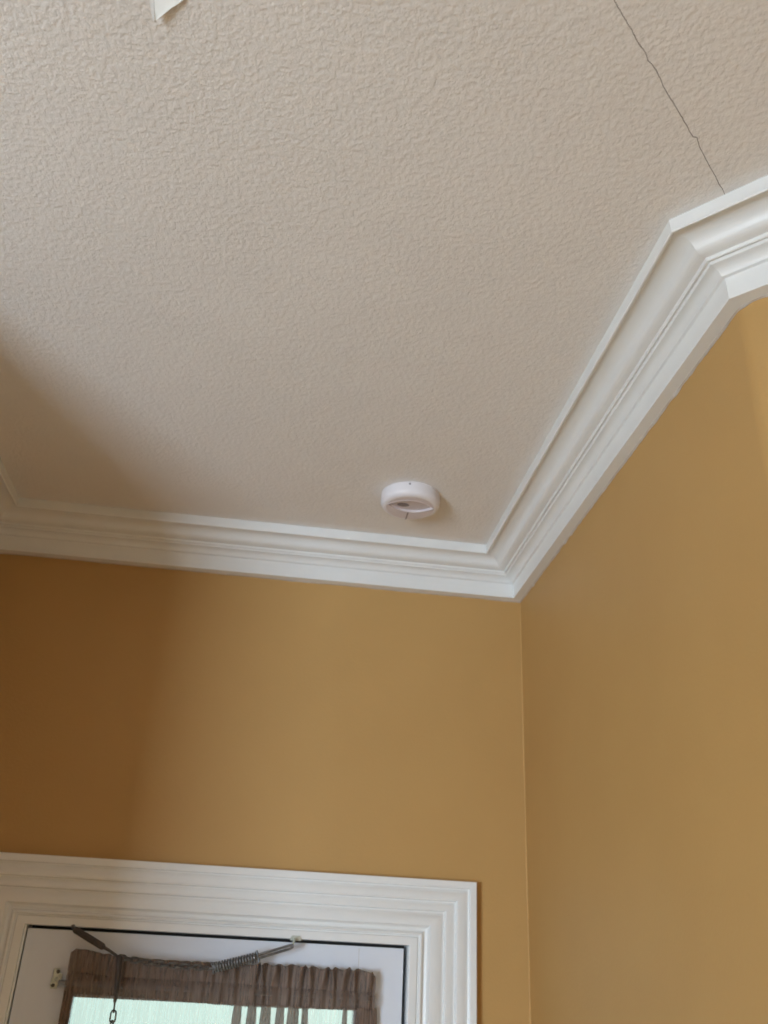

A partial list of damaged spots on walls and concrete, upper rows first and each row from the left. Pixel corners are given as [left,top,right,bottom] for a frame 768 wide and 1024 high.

crack [614,0,725,194]